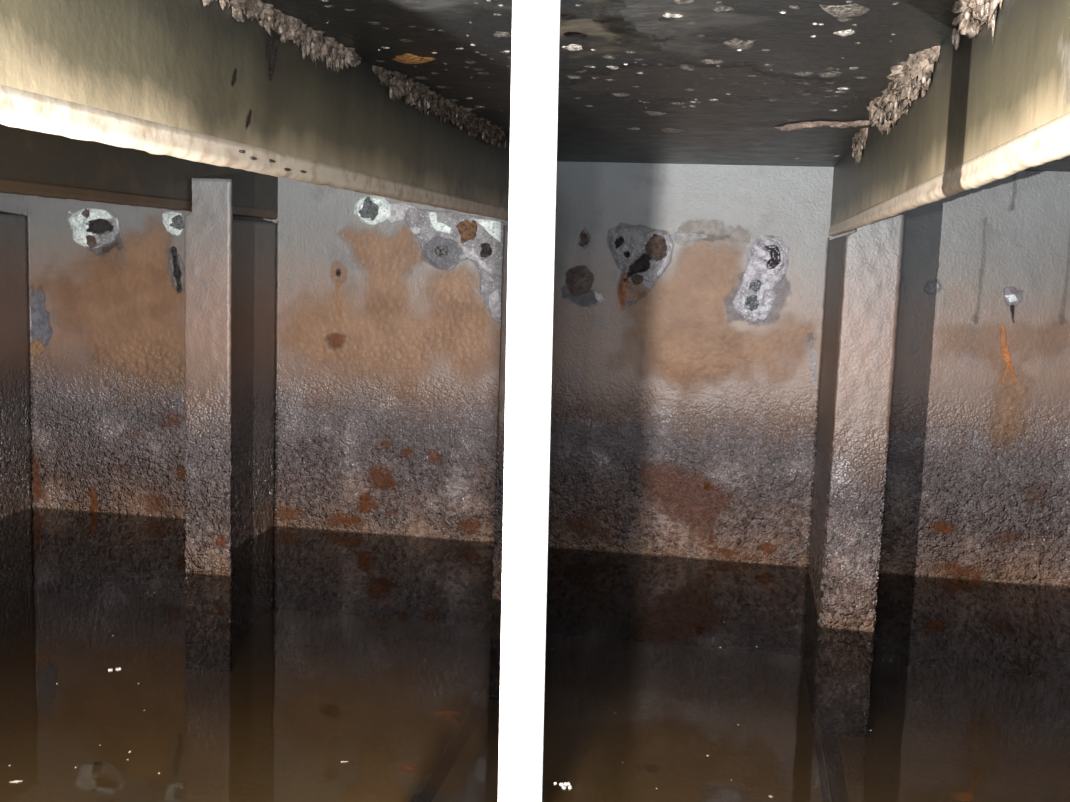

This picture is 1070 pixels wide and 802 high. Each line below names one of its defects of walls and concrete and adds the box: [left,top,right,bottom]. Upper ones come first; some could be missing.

rust [404,208,504,323]
rust [630,244,811,388]
rust [332,468,393,526]